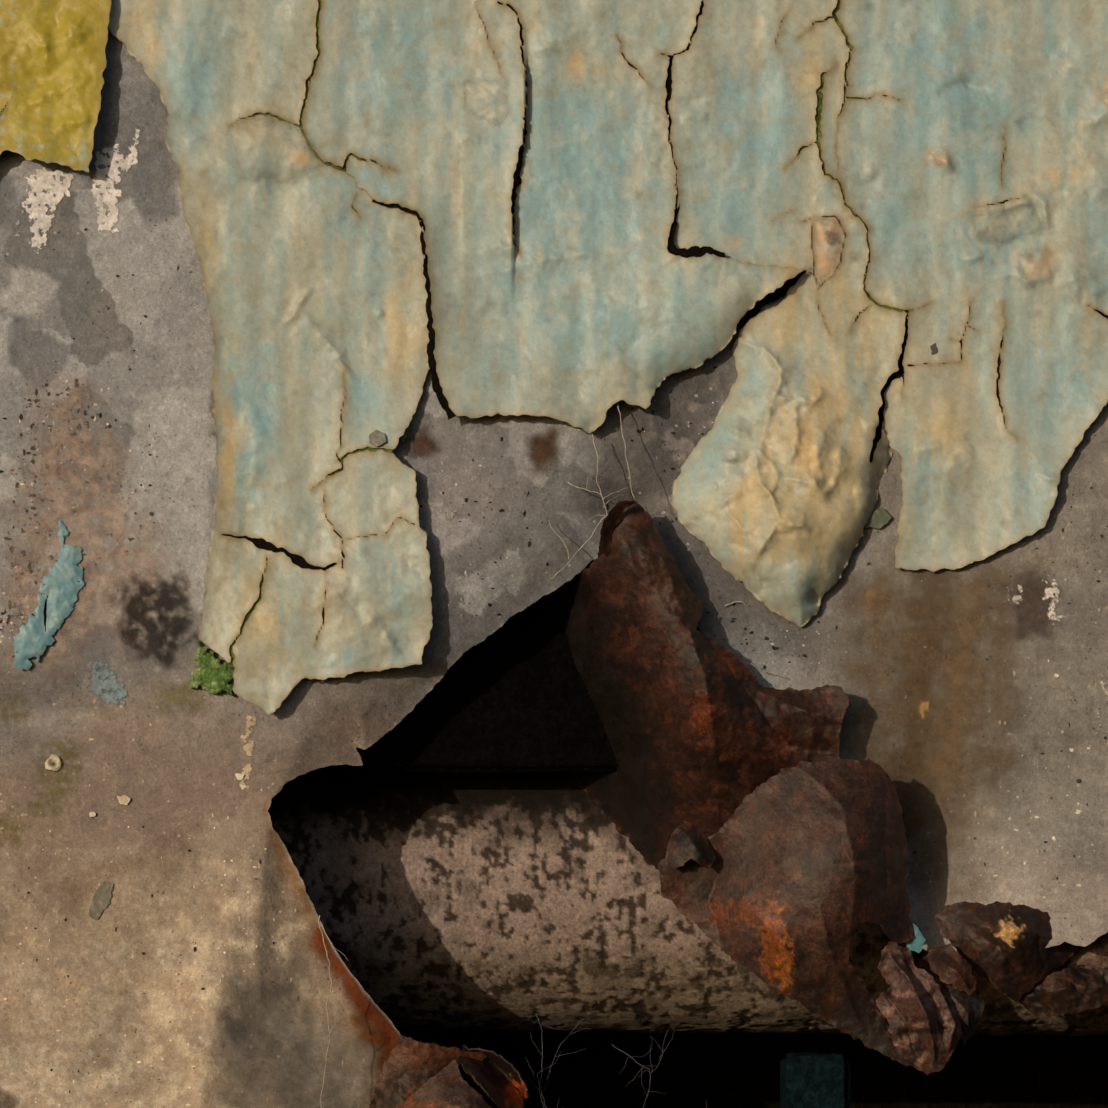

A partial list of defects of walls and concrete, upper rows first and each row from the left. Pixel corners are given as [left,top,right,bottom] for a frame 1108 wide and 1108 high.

crack [240,0,389,172]
crack [352,199,456,420]
crack [479,2,528,254]
peeling [0,0,1108,715]
crack [662,1,725,258]
crack [737,0,970,463]
crack [222,403,393,668]
rust [598,500,635,555]
damp [842,577,1023,863]
rust [313,926,398,1071]
rust [658,756,916,1066]
rust [1015,964,1108,1017]